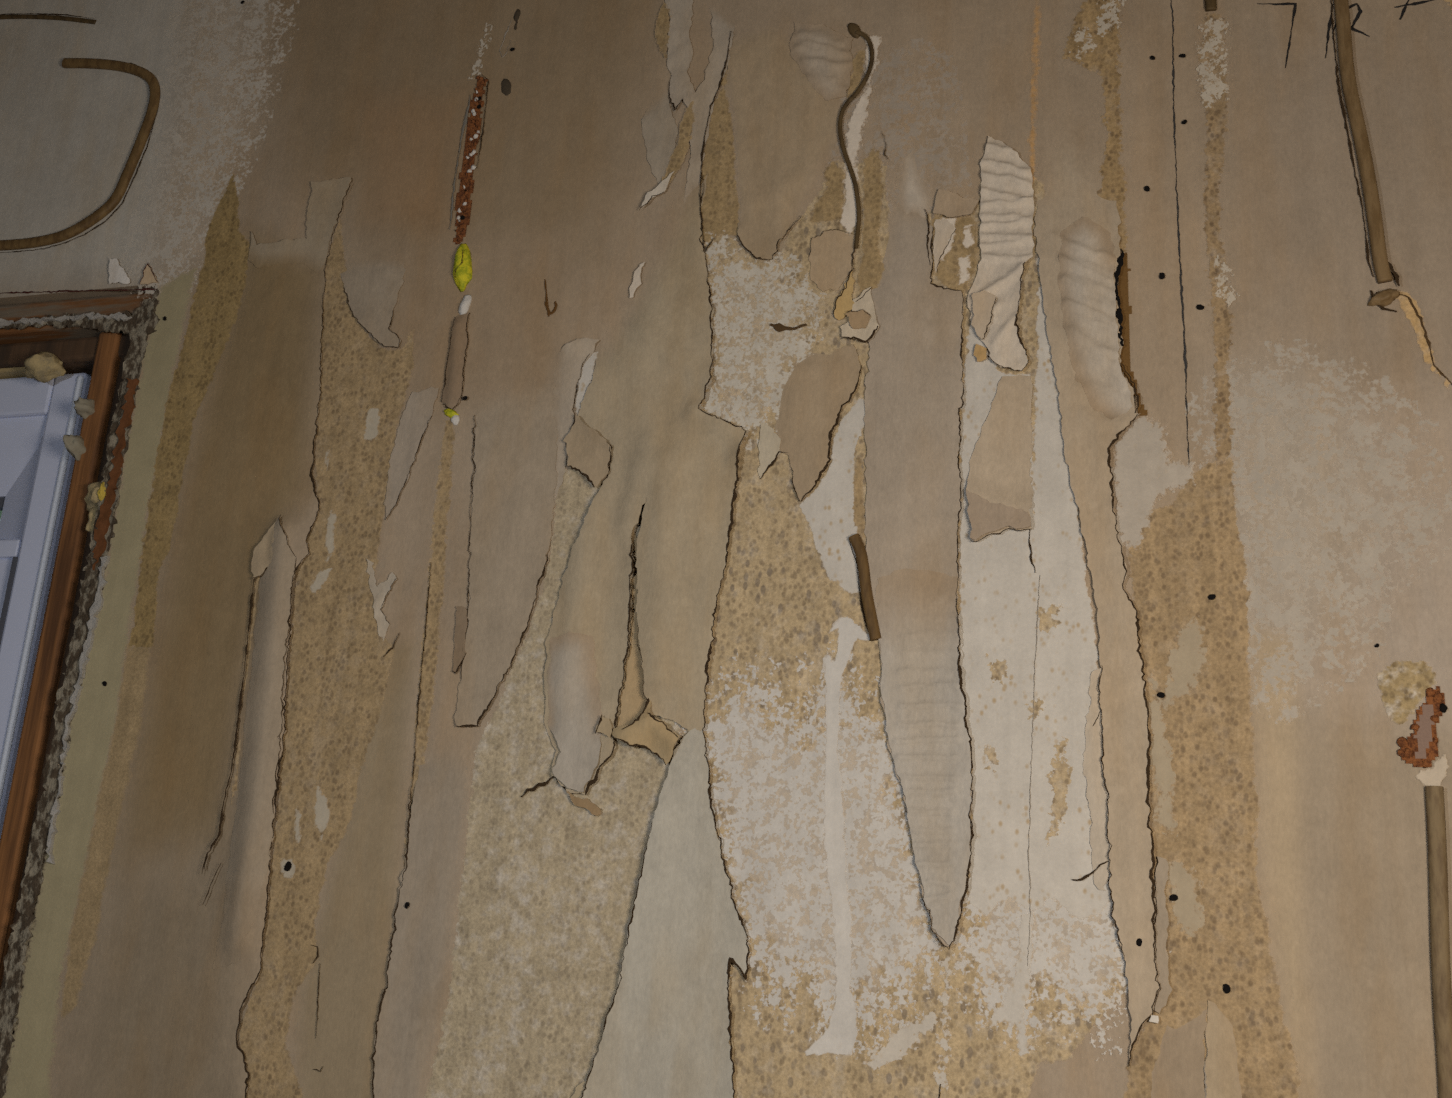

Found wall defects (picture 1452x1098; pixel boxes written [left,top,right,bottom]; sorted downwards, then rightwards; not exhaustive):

flaking render [1111,414,1196,548]
flaking render [675,230,1130,1091]
crack [312,945,320,1028]